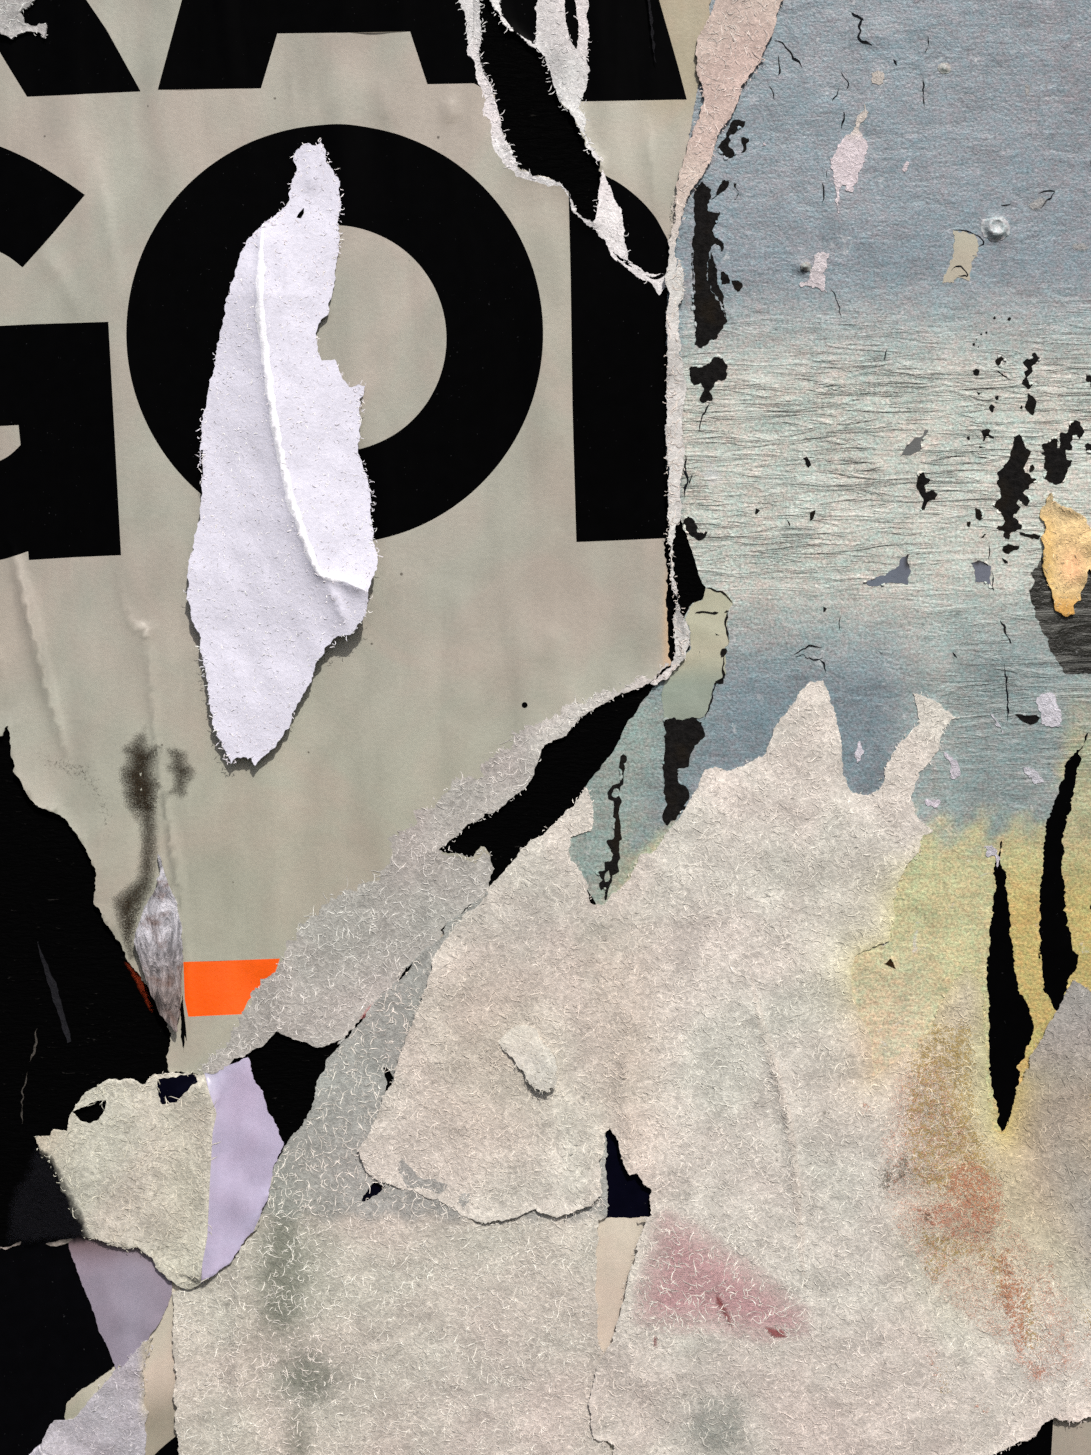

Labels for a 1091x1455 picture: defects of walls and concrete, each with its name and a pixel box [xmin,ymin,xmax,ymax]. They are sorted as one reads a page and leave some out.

peeling [717,120,749,160]
peeling [689,180,743,403]
peeling [966,352,1042,454]
peeling [967,420,1091,589]
spalling [661,587,733,826]
peeling [595,754,627,900]
peeling [46,1238,72,1246]